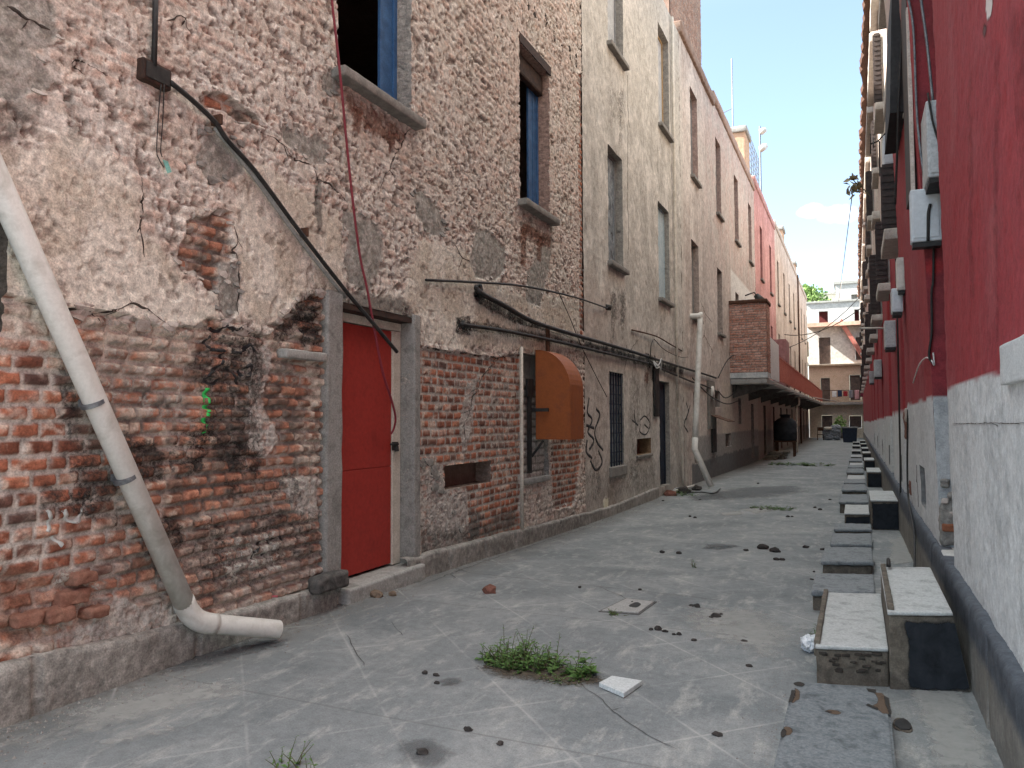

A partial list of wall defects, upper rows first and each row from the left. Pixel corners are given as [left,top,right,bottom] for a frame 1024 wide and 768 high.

crack [137,177,145,257]
crack [68,300,166,323]
flaking render [0,292,181,662]
flaking render [65,207,349,614]
leakage [224,443,309,501]
flaking render [420,345,520,553]
flaking render [550,439,583,510]
leakage [226,532,279,576]